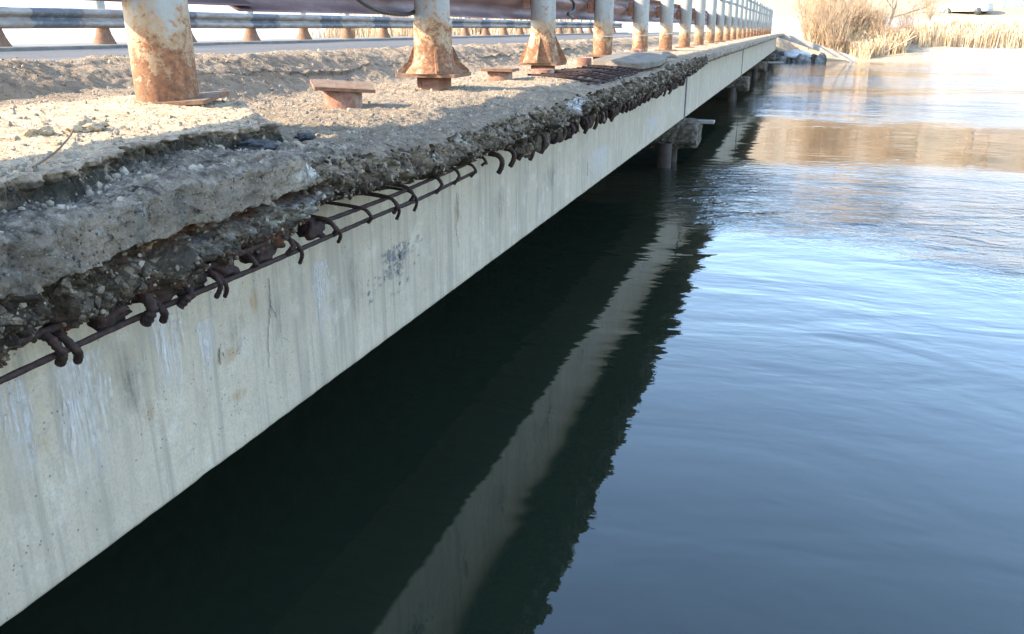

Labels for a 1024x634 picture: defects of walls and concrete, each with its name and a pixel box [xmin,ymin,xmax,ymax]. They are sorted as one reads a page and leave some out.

crack [268,278,277,355]
spalling [0,54,709,385]